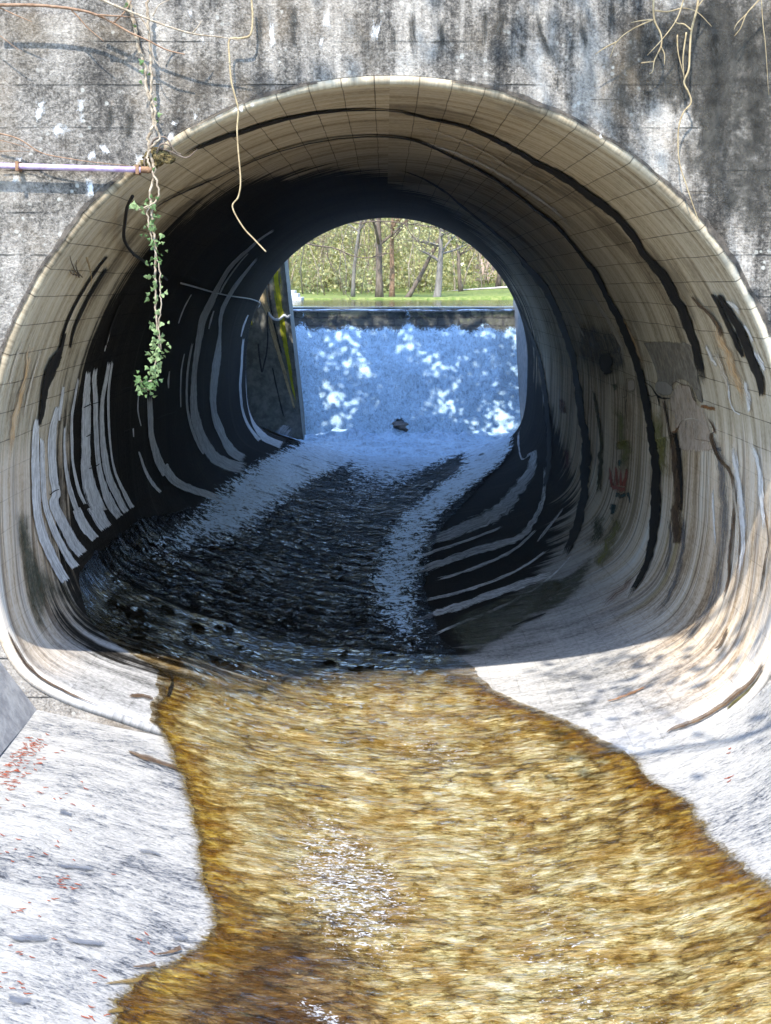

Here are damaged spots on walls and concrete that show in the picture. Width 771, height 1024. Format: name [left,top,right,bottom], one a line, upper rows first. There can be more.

leakage [482,13,506,41]
leakage [537,20,552,56]
leakage [669,32,688,113]
flaking render [644,342,714,451]